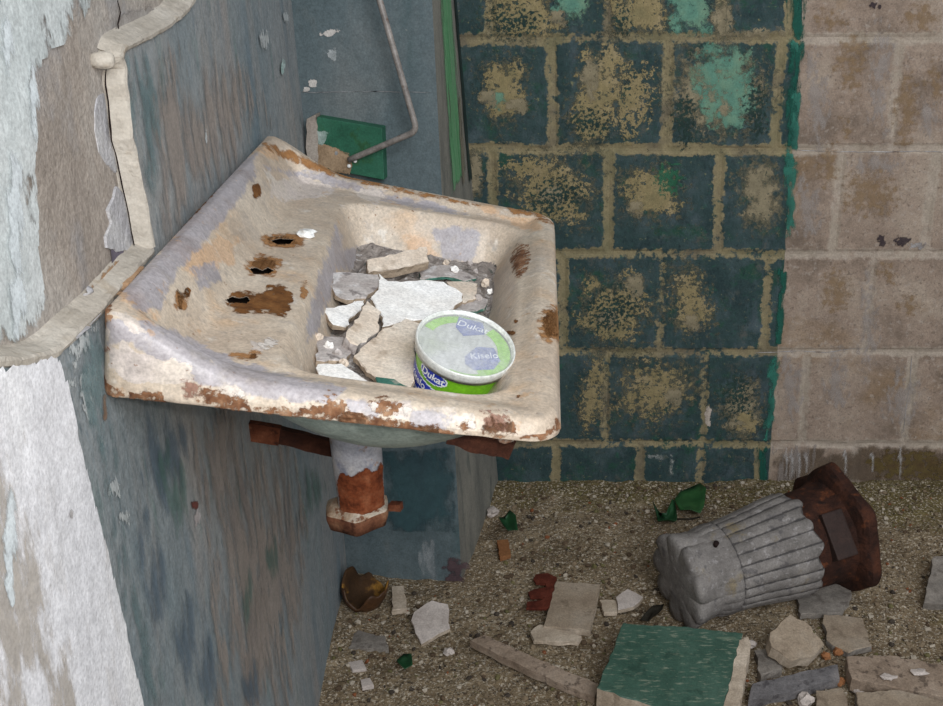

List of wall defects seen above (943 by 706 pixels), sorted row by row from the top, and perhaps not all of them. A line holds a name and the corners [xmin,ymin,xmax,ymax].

crack [105,70,135,245]
peeling [469,0,791,239]
peeling [0,0,196,706]
peeling [560,251,769,452]
damp [772,445,943,482]